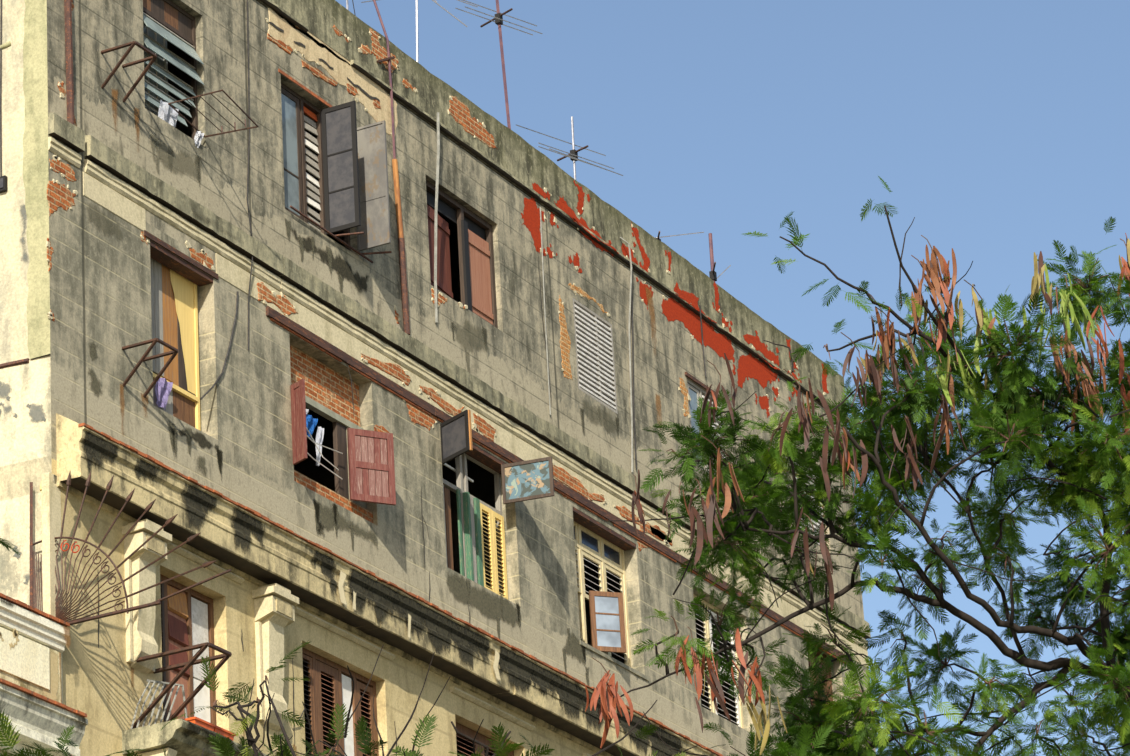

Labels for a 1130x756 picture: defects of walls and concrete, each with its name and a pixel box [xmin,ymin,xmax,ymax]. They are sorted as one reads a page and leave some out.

spalling [265,7,418,137]
spalling [448,96,496,148]
spalling [47,155,78,216]
damp [285,219,368,307]
spalling [257,282,298,318]
peeling [521,181,802,418]
damp [82,431,118,474]
damp [169,422,223,475]
damp [181,483,216,528]
damp [231,509,263,551]
damp [314,499,378,551]
damp [311,550,603,731]